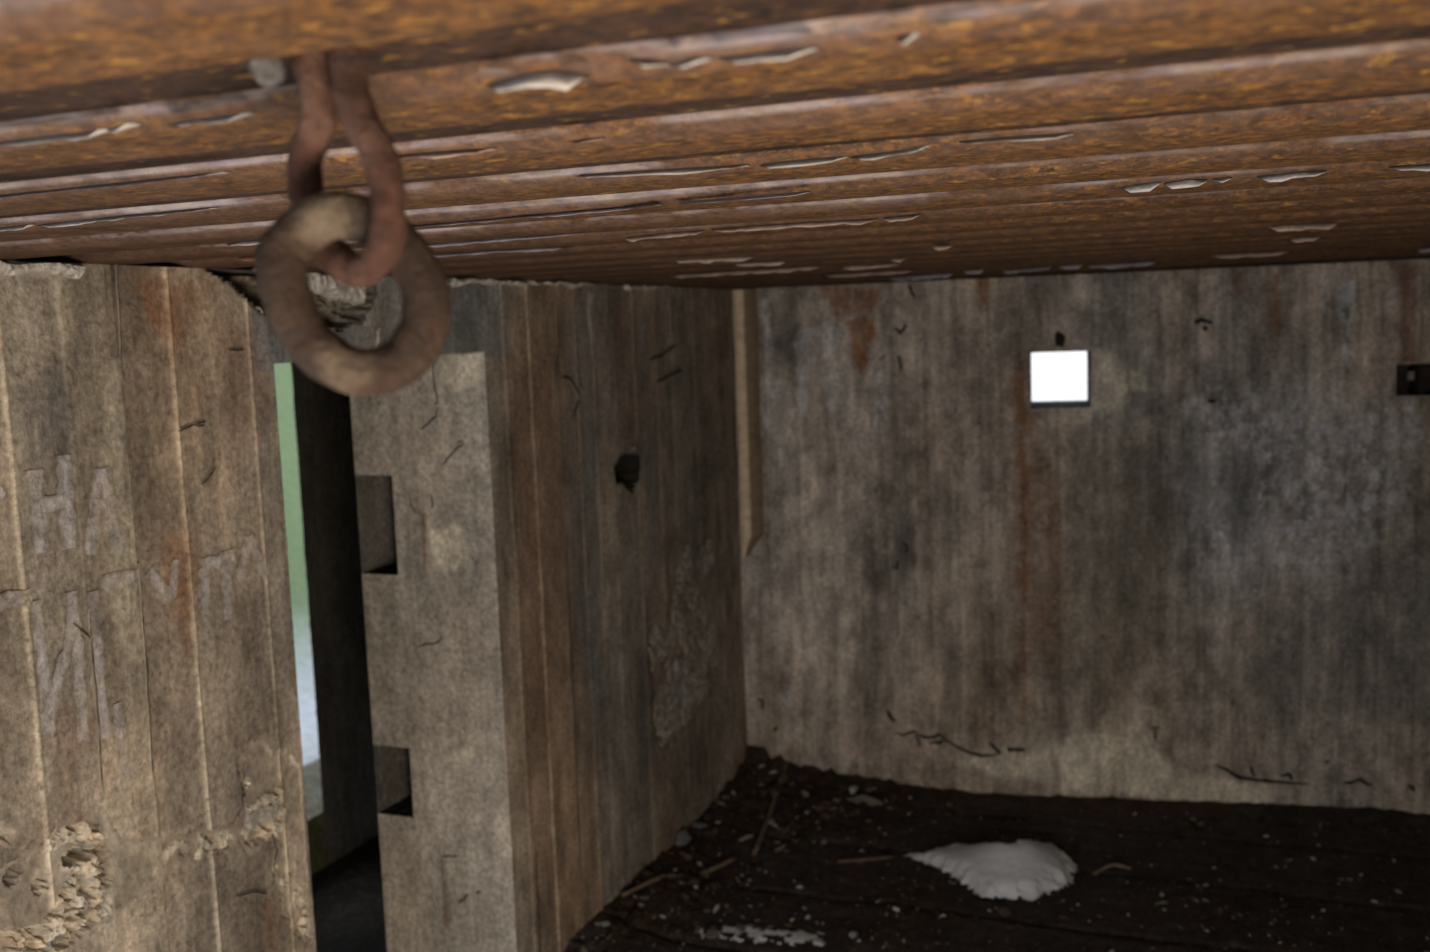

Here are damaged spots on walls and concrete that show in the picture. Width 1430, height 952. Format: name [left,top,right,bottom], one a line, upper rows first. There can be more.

peeling [1388,163,1430,171]
crack [886,709,1025,758]
crack [1214,759,1373,787]
crack [1407,784,1416,792]
spalling [0,731,313,952]